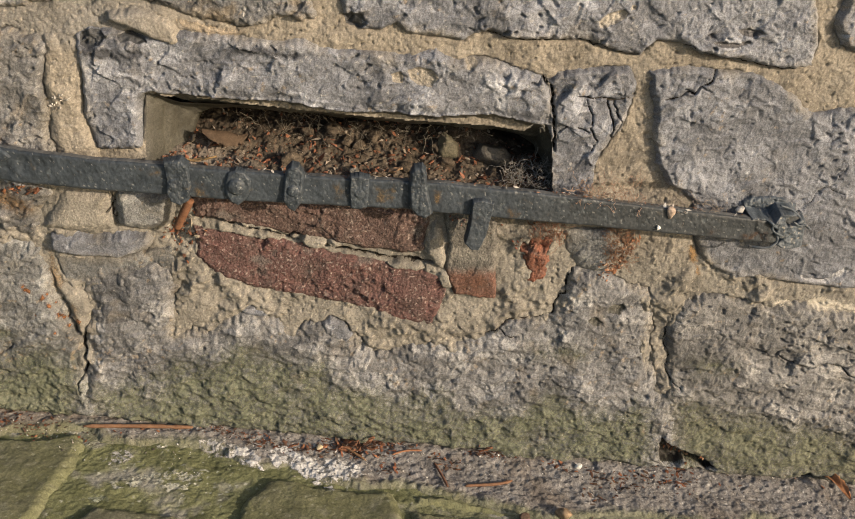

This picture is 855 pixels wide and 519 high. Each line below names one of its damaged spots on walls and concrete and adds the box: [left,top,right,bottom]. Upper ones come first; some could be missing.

crack [665,44,794,100]
crack [543,75,629,151]
crack [487,267,572,338]
crack [77,331,90,384]
water stain [110,471,202,504]
water stain [199,438,365,490]
spalling [658,438,714,468]